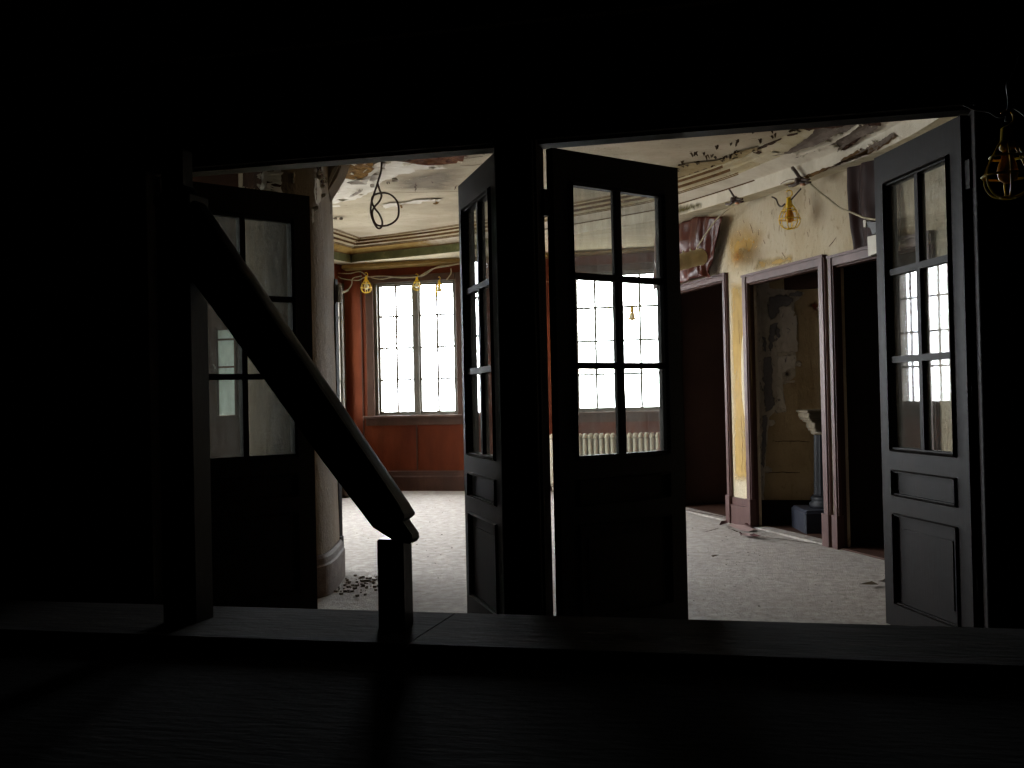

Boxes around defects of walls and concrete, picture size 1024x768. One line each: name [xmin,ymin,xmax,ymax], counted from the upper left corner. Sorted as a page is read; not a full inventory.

spalling [675,123,895,177]
peeling [311,155,470,223]
peeling [761,295,798,467]